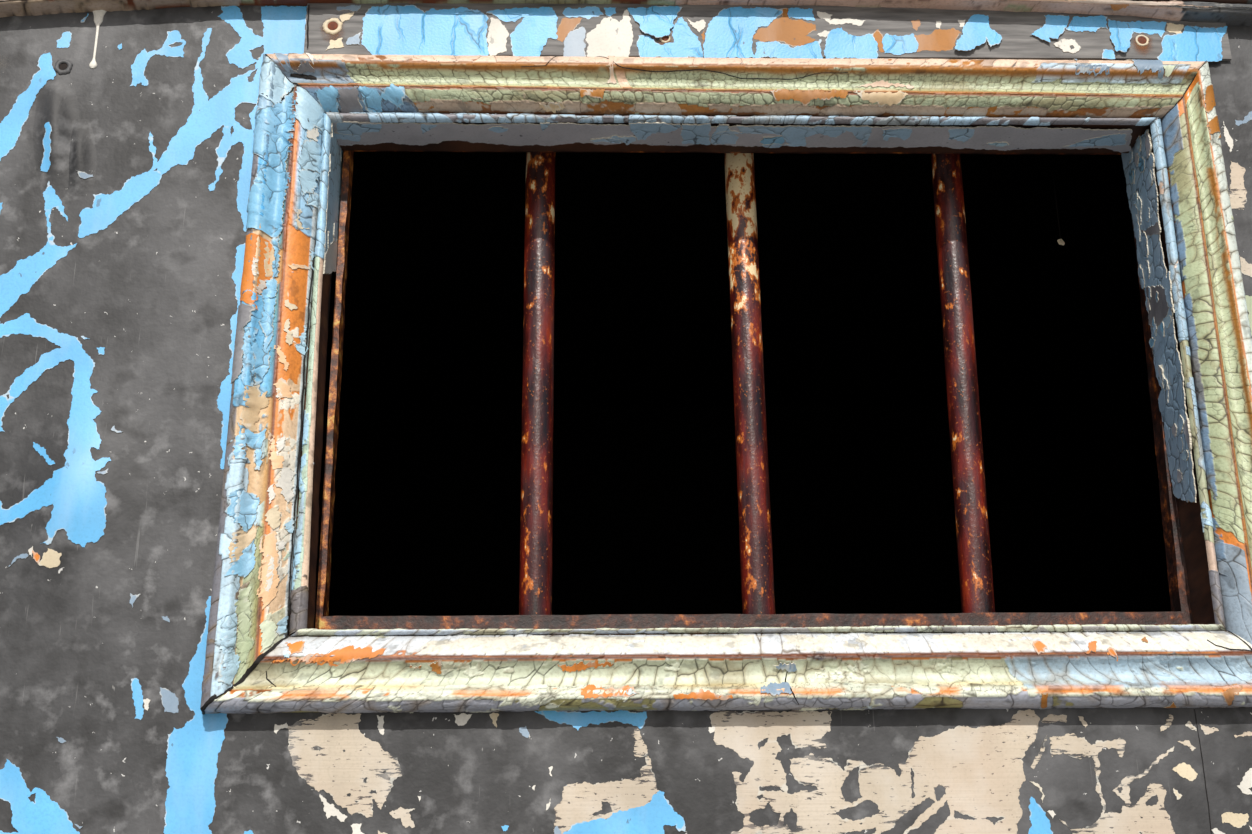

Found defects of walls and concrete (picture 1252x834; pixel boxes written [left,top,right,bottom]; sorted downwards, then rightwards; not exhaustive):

peeling [1025,0,1252,79]
peeling [1204,84,1252,210]
peeling [0,0,1197,685]
crack [201,239,316,715]
peeling [0,760,83,834]
peeling [131,596,228,834]
peeling [274,713,421,834]
peeling [454,713,472,726]
peeling [534,684,686,834]
peeling [673,689,1219,834]
peeling [1212,812,1252,834]
peeling [1237,768,1252,795]